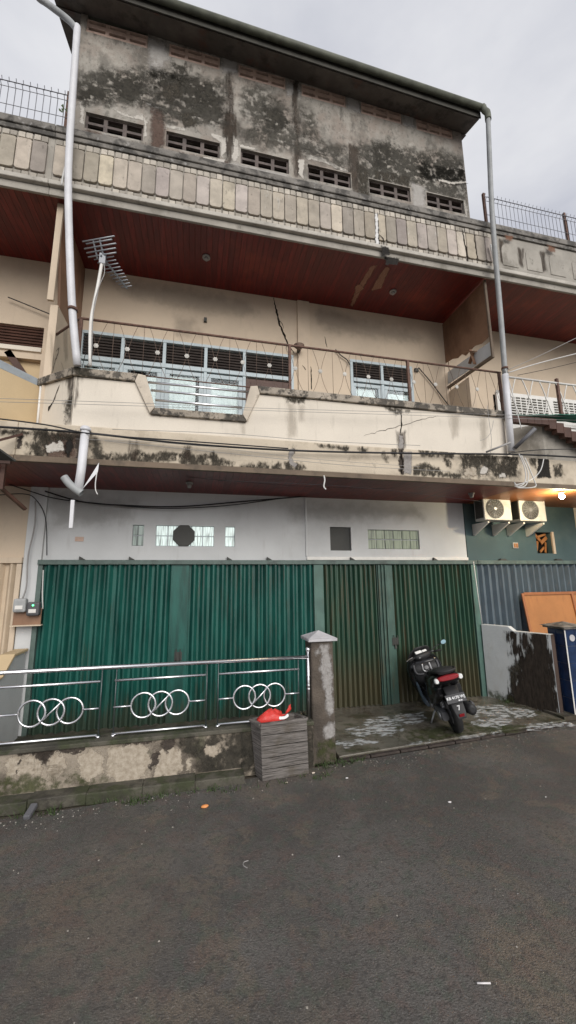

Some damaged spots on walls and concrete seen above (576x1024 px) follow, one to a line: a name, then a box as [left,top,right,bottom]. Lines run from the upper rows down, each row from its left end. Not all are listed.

water stain [76,39,467,209]
crack [273,298,312,389]
water stain [1,429,29,449]
water stain [74,433,306,470]
crack [364,407,429,475]
water stain [413,450,461,479]
water stain [462,631,574,739]
peeling [3,743,196,784]
peeling [204,745,221,758]